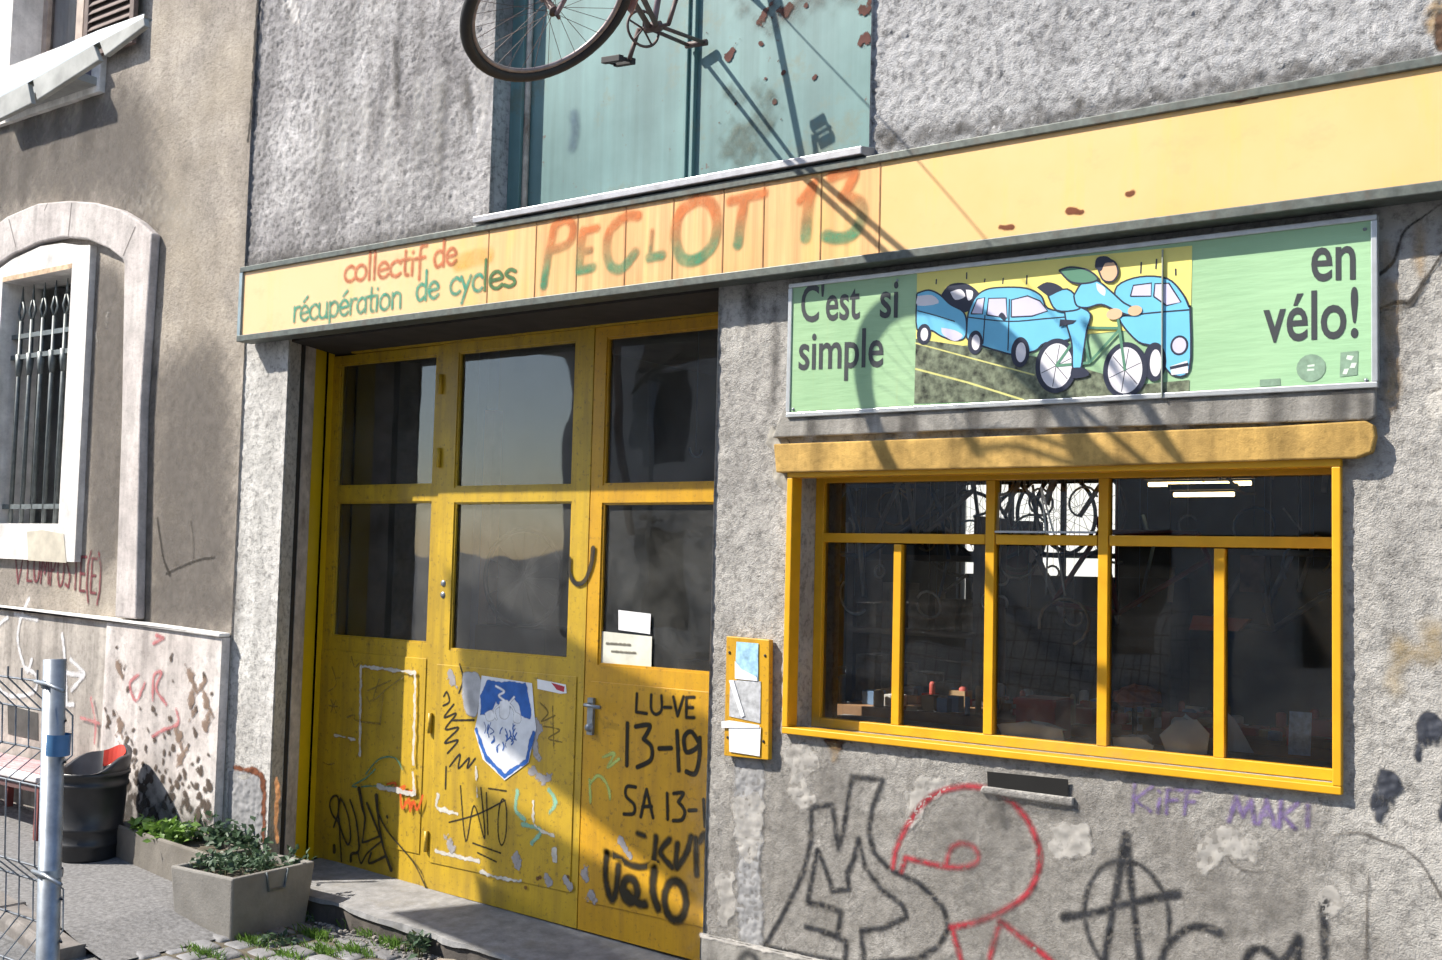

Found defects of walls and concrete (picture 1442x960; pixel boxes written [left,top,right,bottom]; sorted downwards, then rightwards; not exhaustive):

rust [756,0,808,46]
rust [857,0,872,47]
rust [1428,0,1442,51]
crack [1379,207,1442,311]